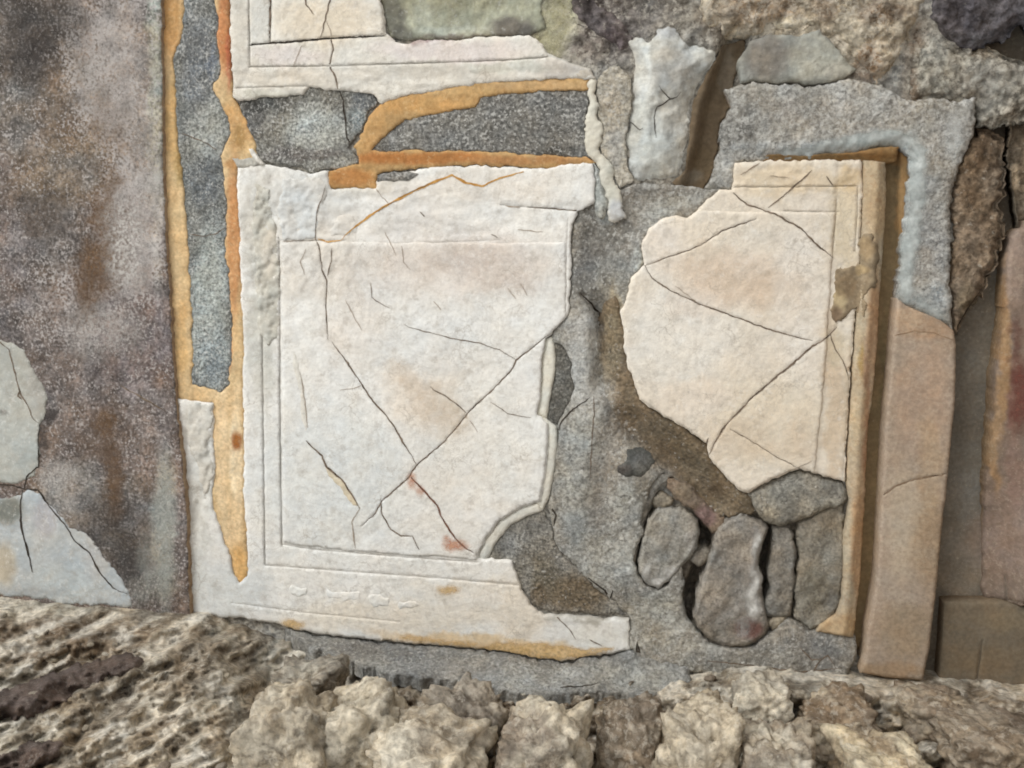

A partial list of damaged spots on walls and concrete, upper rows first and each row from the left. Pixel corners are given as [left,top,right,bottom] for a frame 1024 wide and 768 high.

crack [0,342,127,594]
crack [284,171,548,552]
crack [506,204,577,212]
spalling [479,337,625,615]
spalling [617,447,655,477]
crack [644,163,849,468]
crack [883,473,946,495]